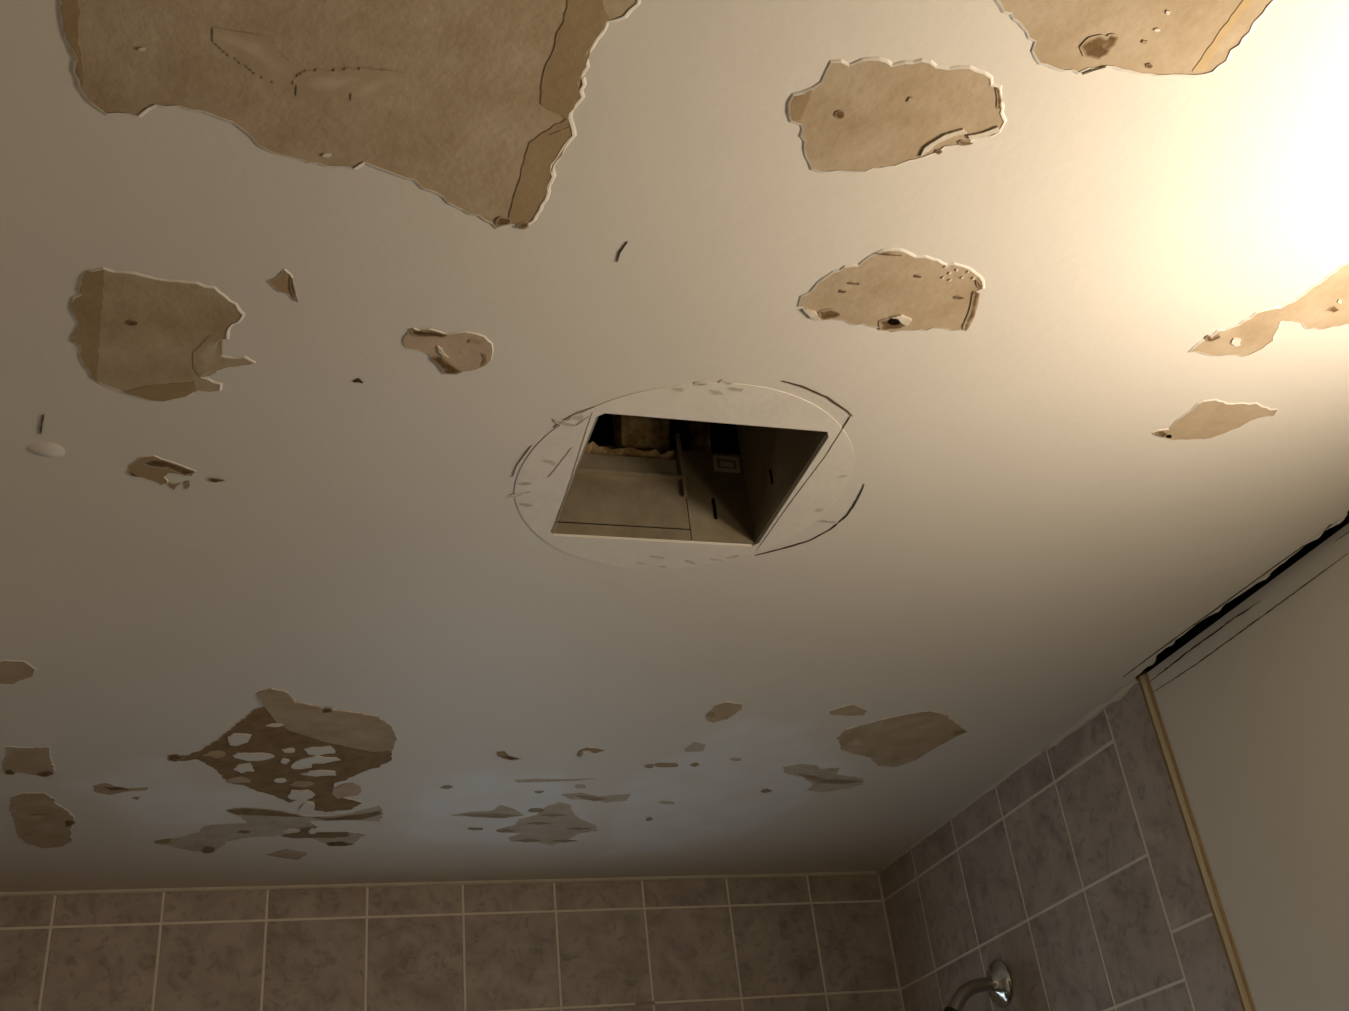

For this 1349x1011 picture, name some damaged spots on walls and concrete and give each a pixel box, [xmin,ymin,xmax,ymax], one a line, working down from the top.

peeling [993,0,1276,78]
peeling [57,0,641,229]
peeling [785,56,1007,173]
peeling [69,267,257,402]
peeling [402,327,494,375]
peeling [797,247,985,332]
peeling [1188,260,1349,357]
peeling [1152,399,1278,440]
crack [1123,532,1349,692]
peeling [153,687,398,860]
peeling [450,778,631,845]
peeling [829,704,968,767]